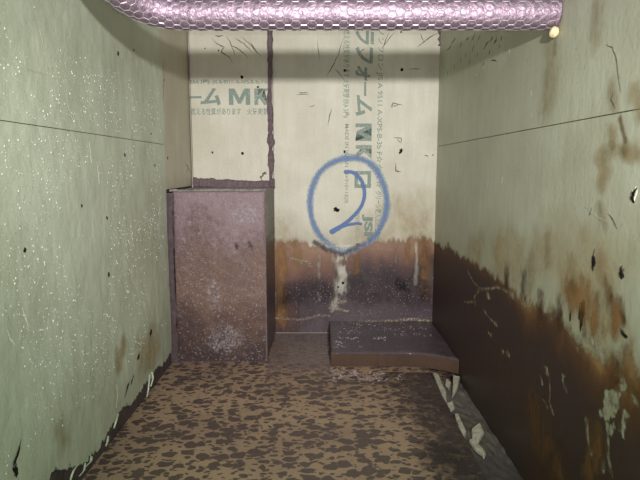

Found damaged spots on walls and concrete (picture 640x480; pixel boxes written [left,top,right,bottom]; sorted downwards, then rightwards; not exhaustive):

damp [619,116,639,159]
corrosion [565,279,599,337]
corrosion [609,289,625,338]
damp [174,231,640,480]
peeling [599,379,638,473]